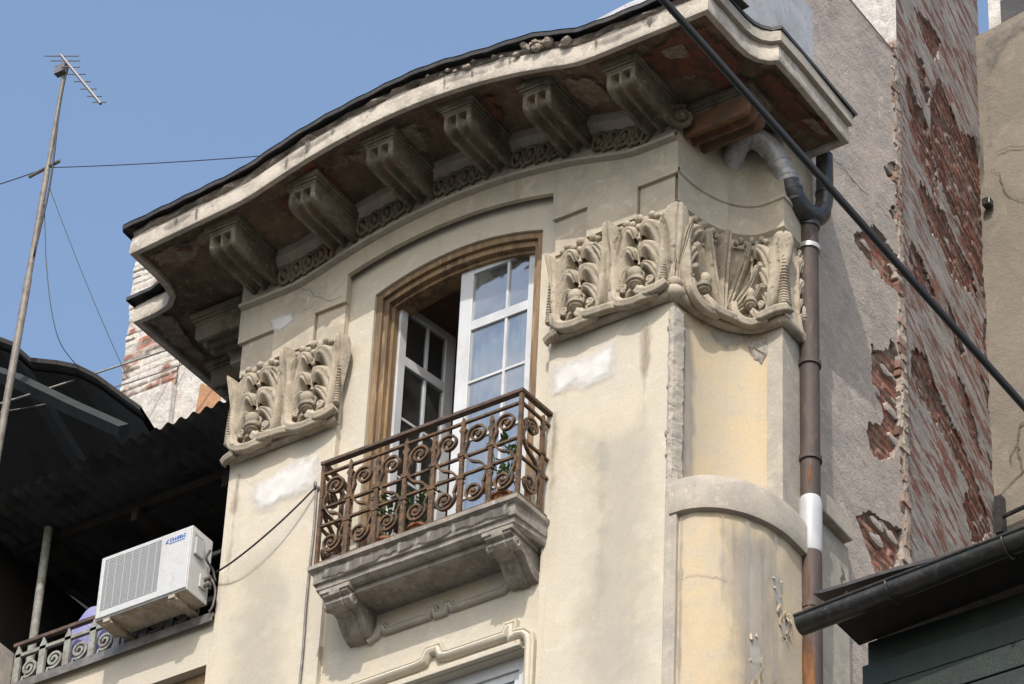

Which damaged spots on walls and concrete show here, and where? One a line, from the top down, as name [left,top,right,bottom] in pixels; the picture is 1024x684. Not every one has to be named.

flaking render [854,13,992,573]
leakage [736,542,776,684]